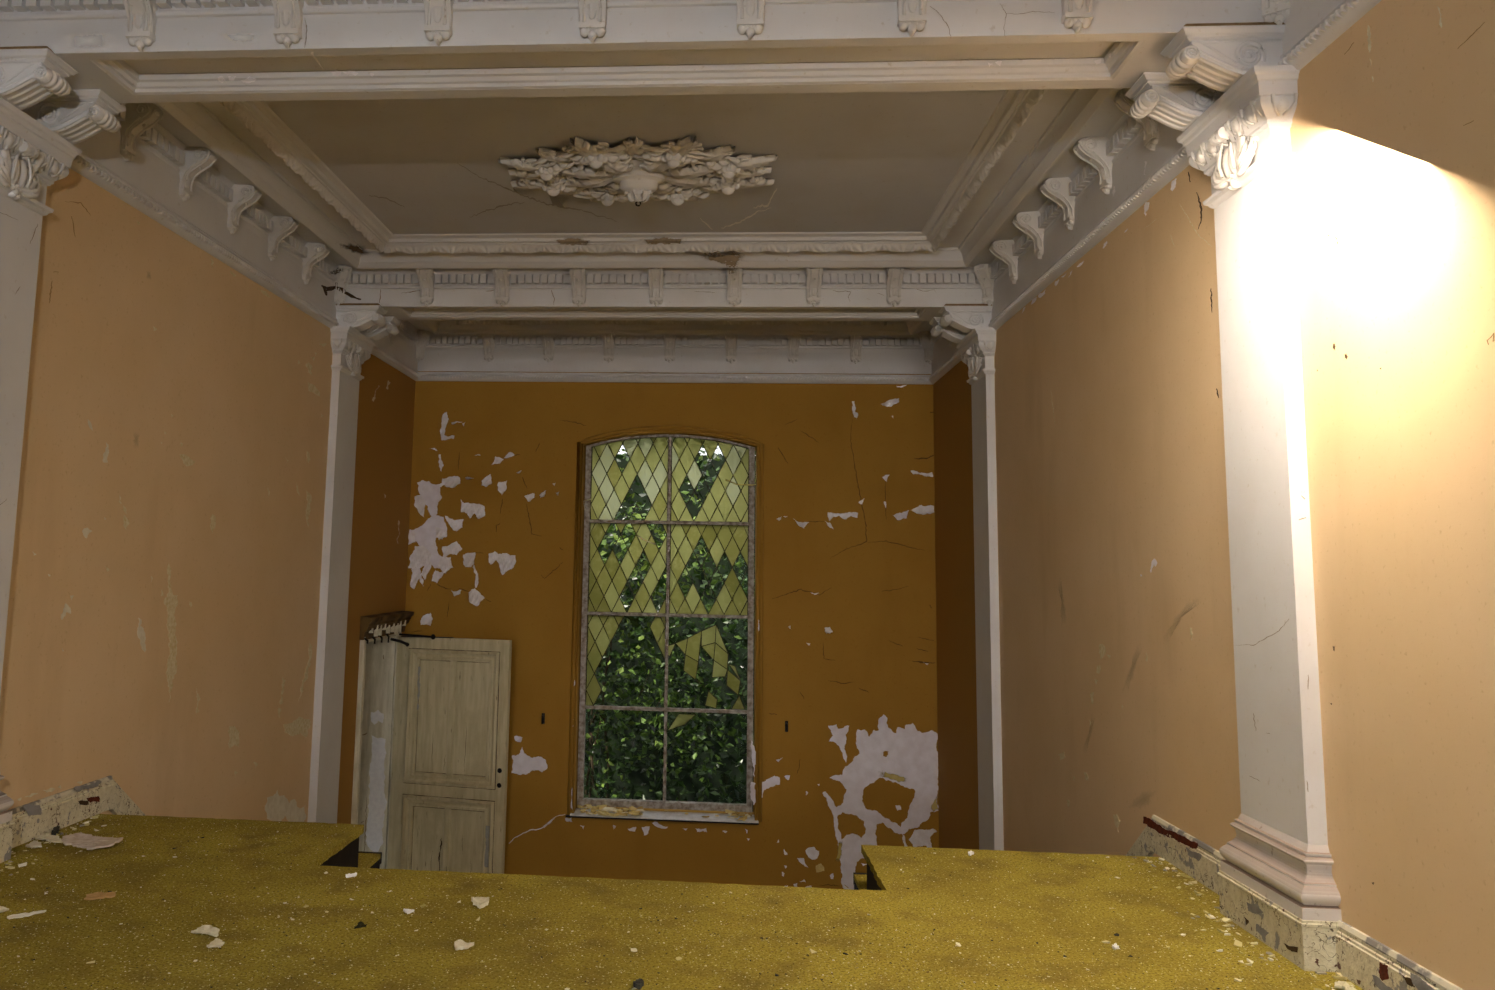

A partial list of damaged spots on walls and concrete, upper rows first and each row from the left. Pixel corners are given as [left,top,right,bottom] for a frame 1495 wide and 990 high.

peeling [882,385,906,417]
peeling [397,412,521,606]
peeling [777,499,864,529]
peeling [884,501,934,520]
peeling [511,736,548,775]
peeling [750,741,790,805]
peeling [777,714,939,890]